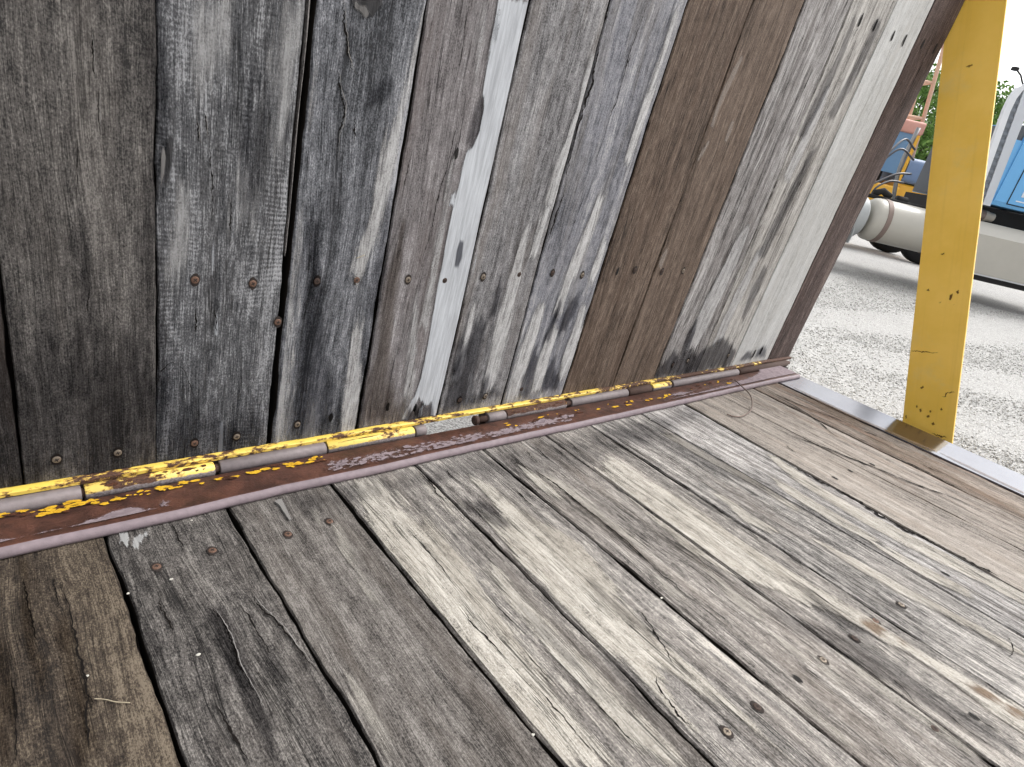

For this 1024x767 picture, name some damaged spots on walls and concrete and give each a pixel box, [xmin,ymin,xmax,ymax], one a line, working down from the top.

crack [337,3,356,153]
peeling [0,409,583,527]
crack [158,598,173,633]
crack [210,594,316,712]
crack [217,706,250,763]